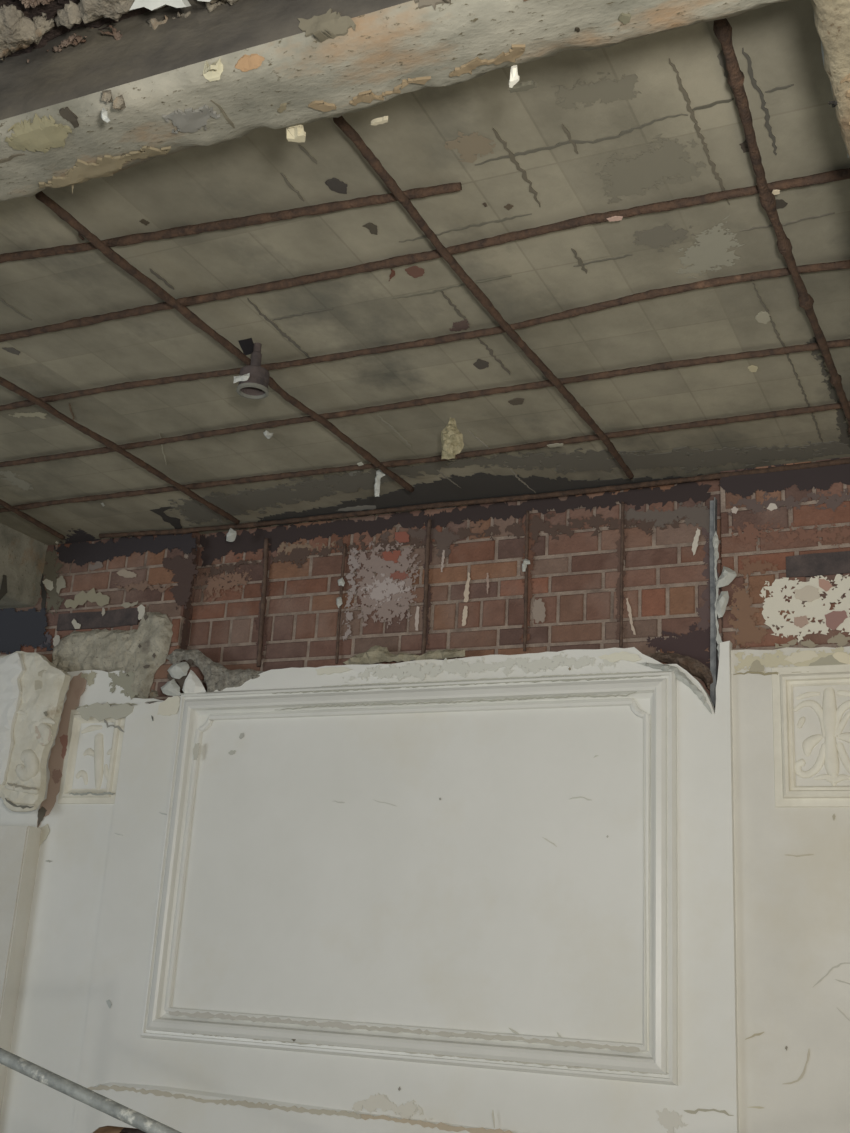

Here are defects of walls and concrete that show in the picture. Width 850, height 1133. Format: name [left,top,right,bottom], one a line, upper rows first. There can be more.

rust [389,266,425,281]
spalling [0,18,850,540]
peeling [42,575,148,629]
peeling [759,574,850,666]
peeling [157,660,193,716]
spalling [37,672,134,845]
crack [813,962,850,1021]